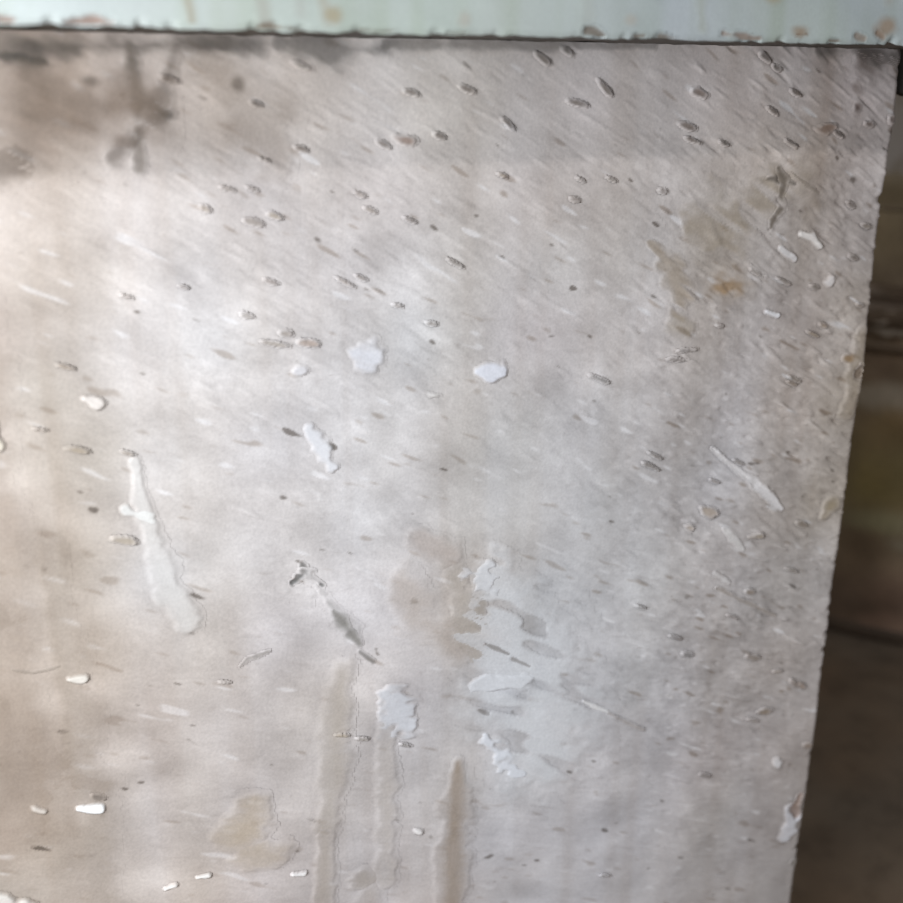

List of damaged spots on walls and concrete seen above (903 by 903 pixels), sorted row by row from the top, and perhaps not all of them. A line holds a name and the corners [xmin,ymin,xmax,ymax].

leakage [0,0,659,200]
peeling [345,333,388,376]
peeling [472,359,509,385]
peeling [79,394,108,412]
peeling [302,421,340,474]
leakage [0,307,136,903]
leakage [381,522,490,676]
peeling [65,672,90,685]
peeling [435,539,646,822]
peeling [374,682,425,749]
spalling [775,790,805,845]
peeling [0,891,39,903]